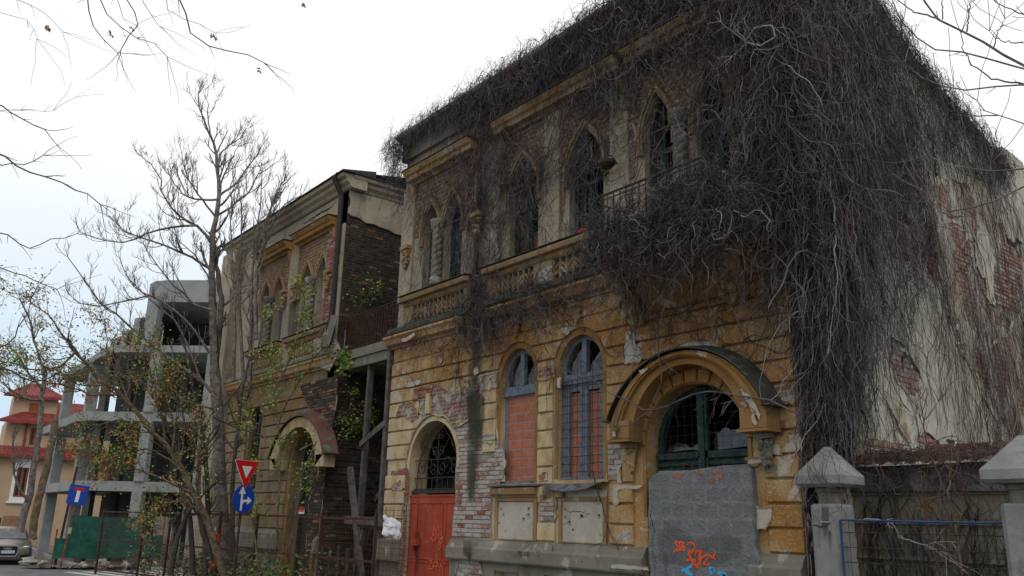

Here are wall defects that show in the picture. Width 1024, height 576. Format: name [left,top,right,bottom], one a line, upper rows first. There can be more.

spalling [395,366,507,540]
spalling [622,331,649,374]
spalling [740,389,761,425]
spalling [883,176,1024,438]
spalling [390,464,410,575]